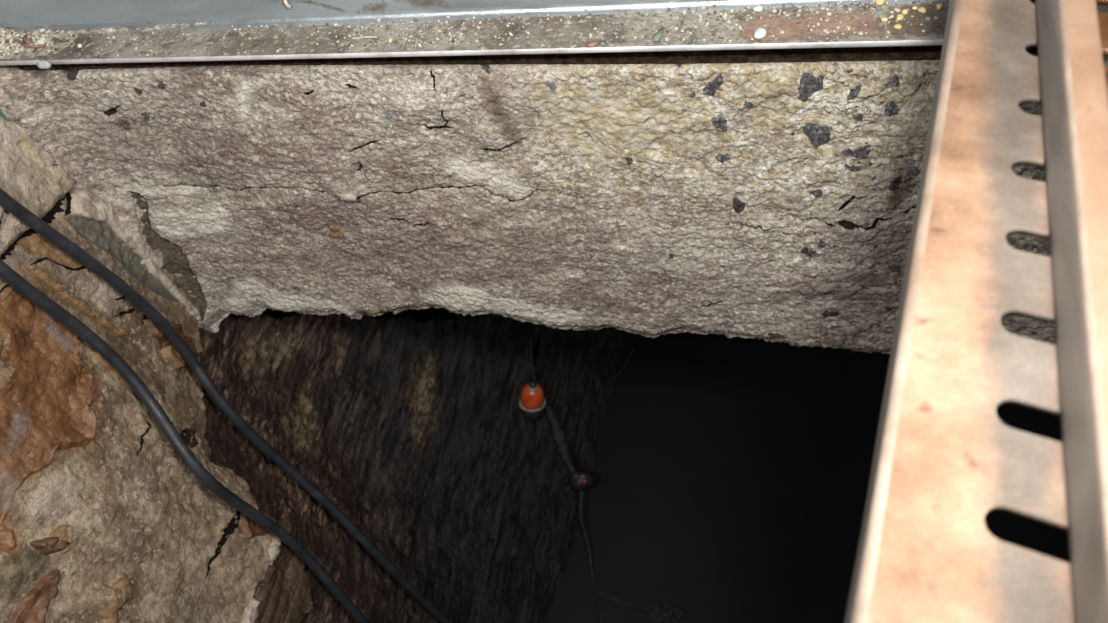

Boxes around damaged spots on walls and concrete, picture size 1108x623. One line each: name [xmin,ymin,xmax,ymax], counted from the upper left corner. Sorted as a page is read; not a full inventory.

crack [423,64,453,129]
spalling [690,73,723,97]
spalling [798,72,824,102]
crack [347,139,381,152]
crack [480,140,518,151]
spalling [801,123,832,148]
spalling [841,148,871,171]
crack [164,185,538,226]
spalling [68,189,223,369]
peeling [29,524,74,556]
crack [206,510,241,577]
peeling [240,510,315,623]